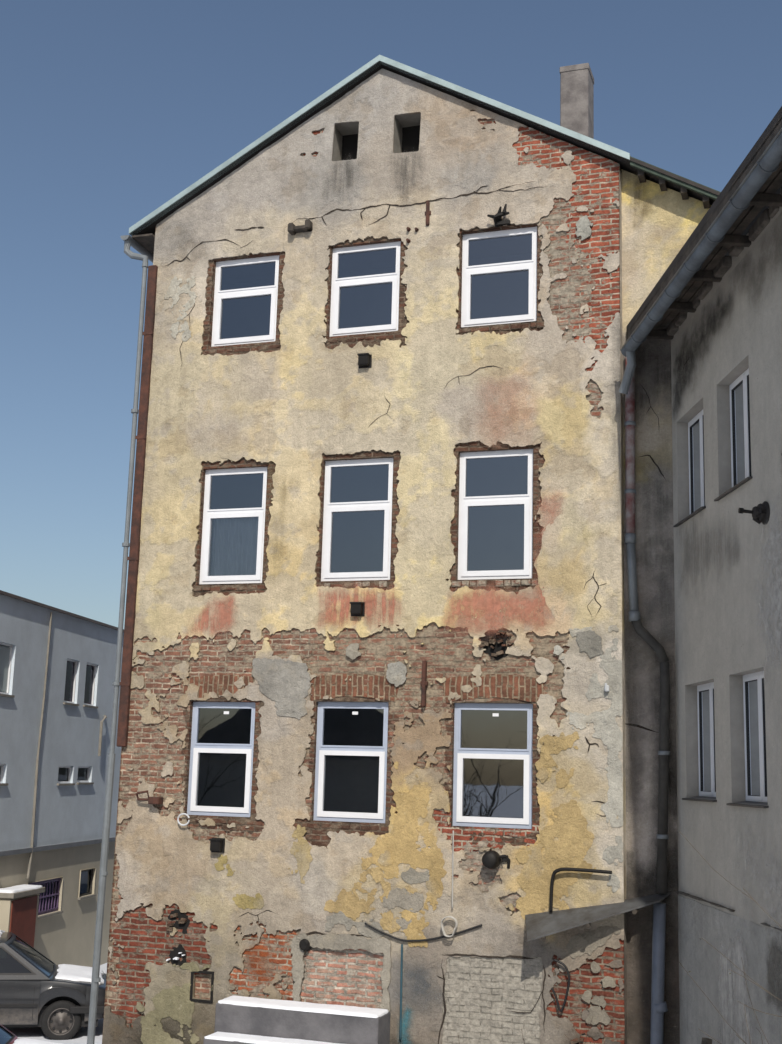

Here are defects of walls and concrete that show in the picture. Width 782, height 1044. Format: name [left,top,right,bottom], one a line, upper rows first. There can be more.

crack [162,227,264,267]
crack [292,181,547,226]
flaking render [512,127,620,419]
crack [584,571,606,617]
flaking render [117,622,623,948]
flaking render [106,854,218,1044]
flaking render [229,893,302,1001]
flaking render [547,926,625,1044]